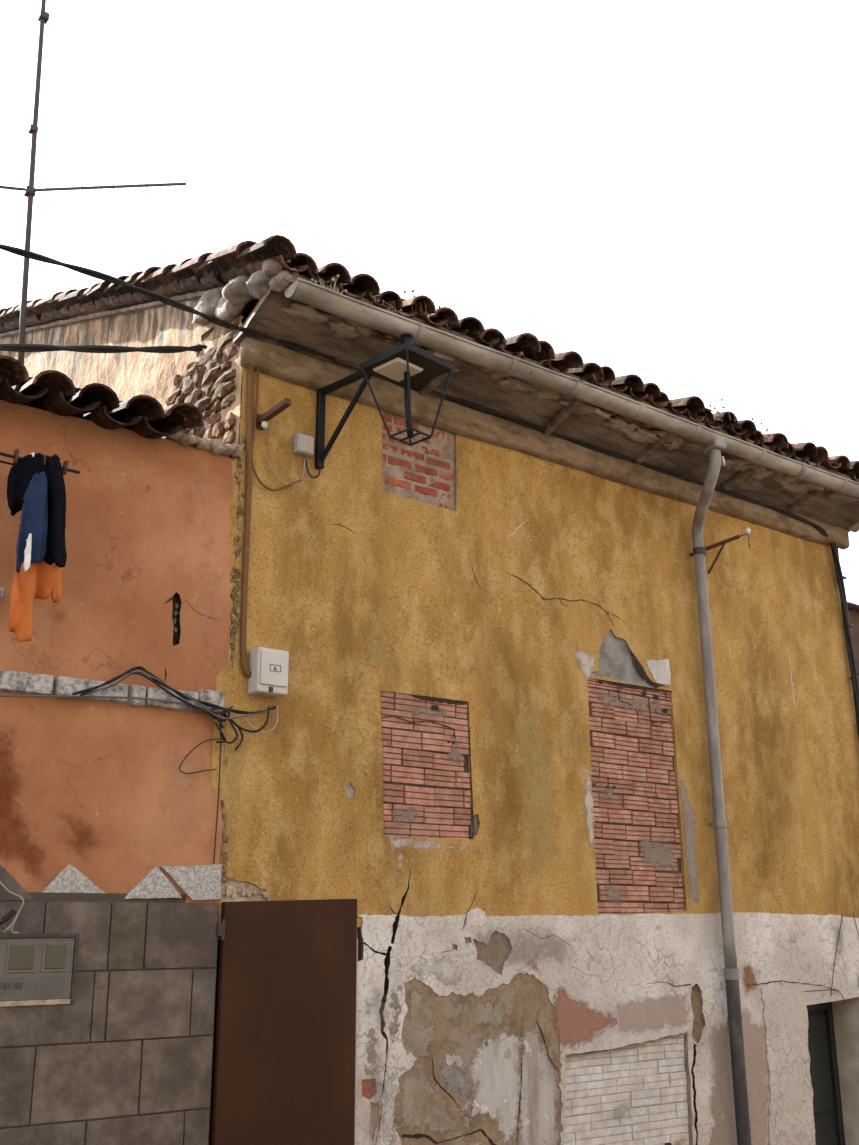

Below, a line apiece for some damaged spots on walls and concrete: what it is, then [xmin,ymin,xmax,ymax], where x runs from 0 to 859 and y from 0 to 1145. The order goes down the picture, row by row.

crack [507,573,626,627]
spalling [591,629,668,713]
crack [361,868,558,1145]
spalling [362,907,563,1145]
crack [690,1043,698,1145]